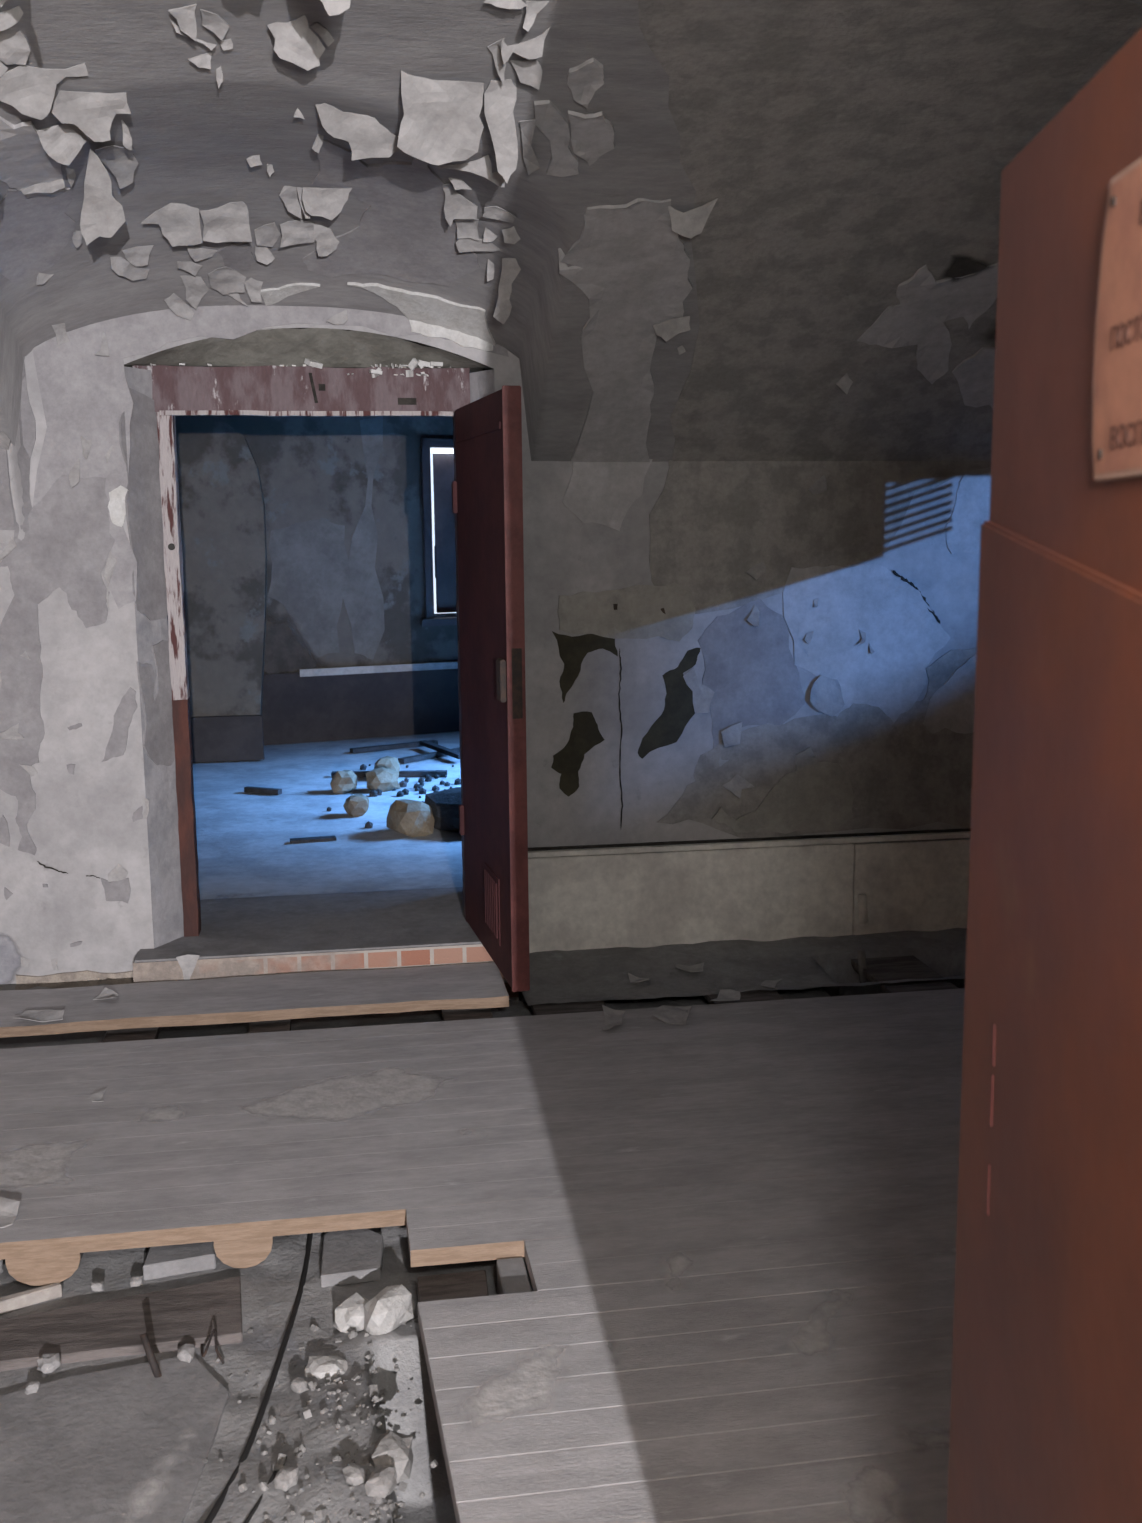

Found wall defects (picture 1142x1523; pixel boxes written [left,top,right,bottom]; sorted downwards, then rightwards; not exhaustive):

peeling [0,0,615,855]
peeling [551,0,1142,839]
peeling [101,863,131,903]